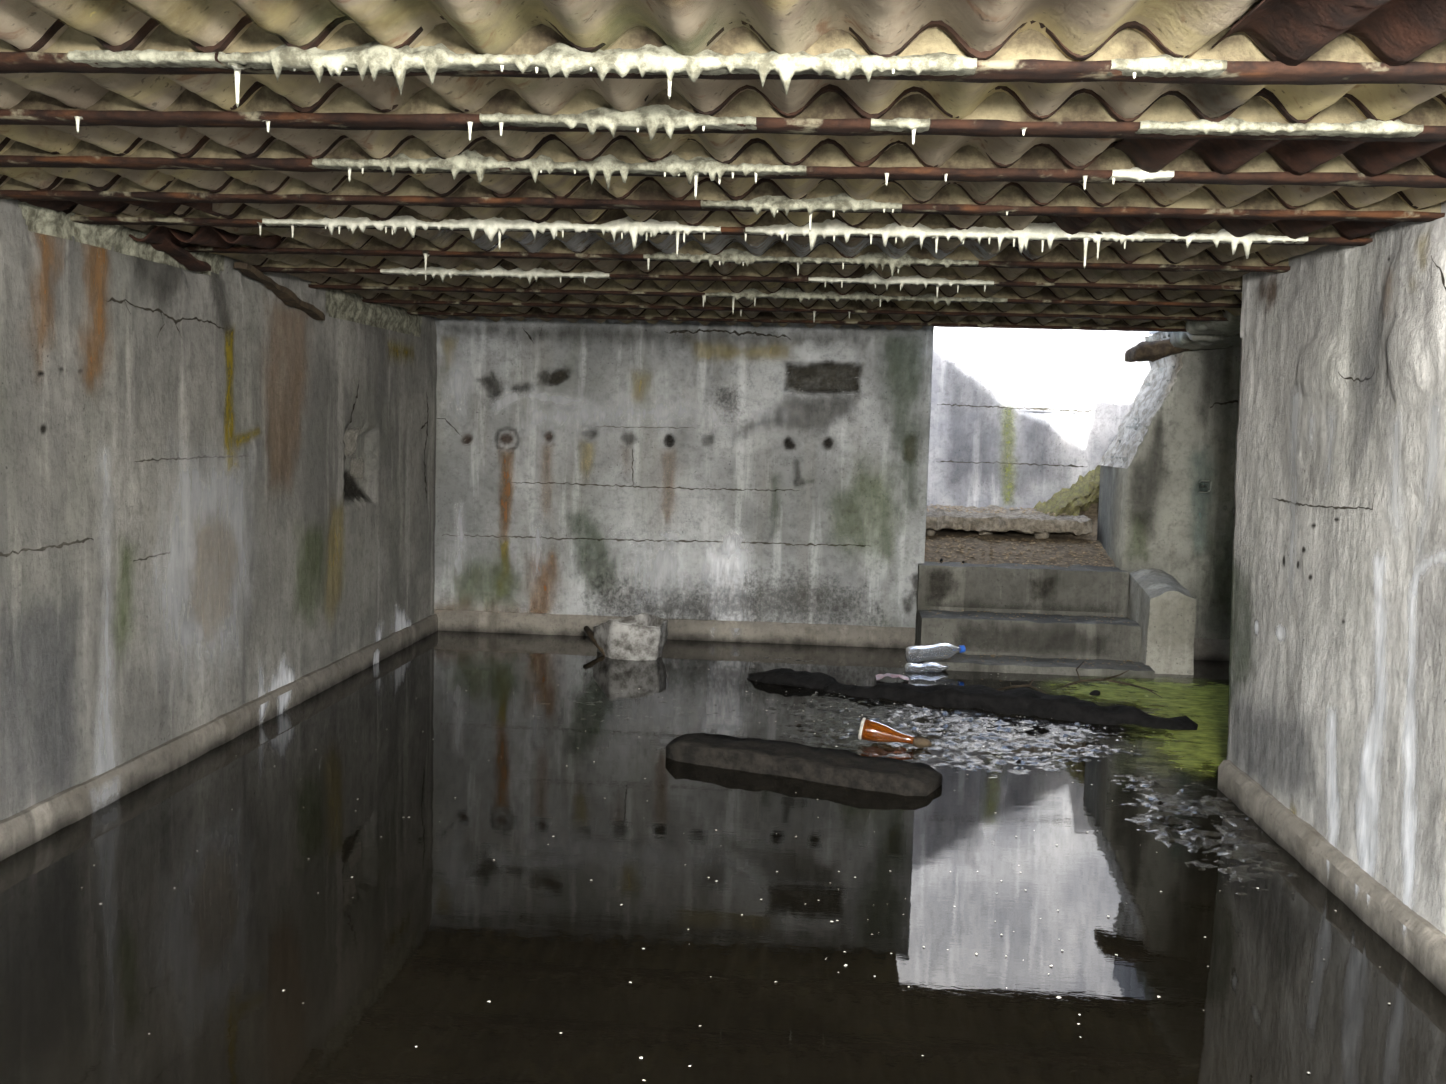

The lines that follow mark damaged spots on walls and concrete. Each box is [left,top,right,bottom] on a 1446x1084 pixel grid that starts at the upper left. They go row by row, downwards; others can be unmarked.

damp [312,104,806,192]
damp [870,117,930,133]
damp [1109,167,1174,182]
rust [37,233,51,343]
rust [87,246,108,383]
crack [103,297,224,338]
damp [262,193,1308,306]
crack [1338,368,1375,382]
rust [500,453,513,535]
crack [1273,495,1375,510]
crack [0,537,94,557]
damp [1402,555,1445,908]